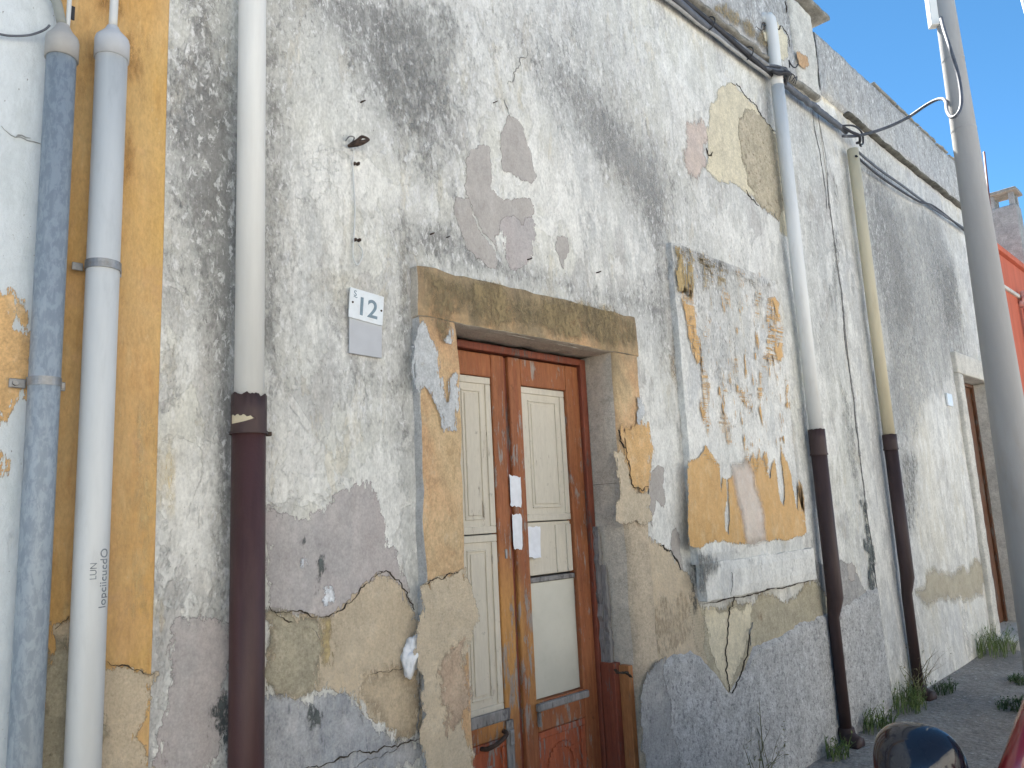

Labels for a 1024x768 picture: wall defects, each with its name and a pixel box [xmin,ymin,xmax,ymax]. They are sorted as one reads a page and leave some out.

peeling [454,115,537,271]
peeling [0,287,30,426]
peeling [412,321,460,433]
crack [813,115,878,589]
flaking render [42,617,70,768]
peeling [102,614,229,768]
crack [269,570,458,640]
crack [306,668,421,768]
flaking render [265,480,480,768]
peeling [593,245,827,768]
crack [705,573,813,693]
leakage [860,500,876,590]